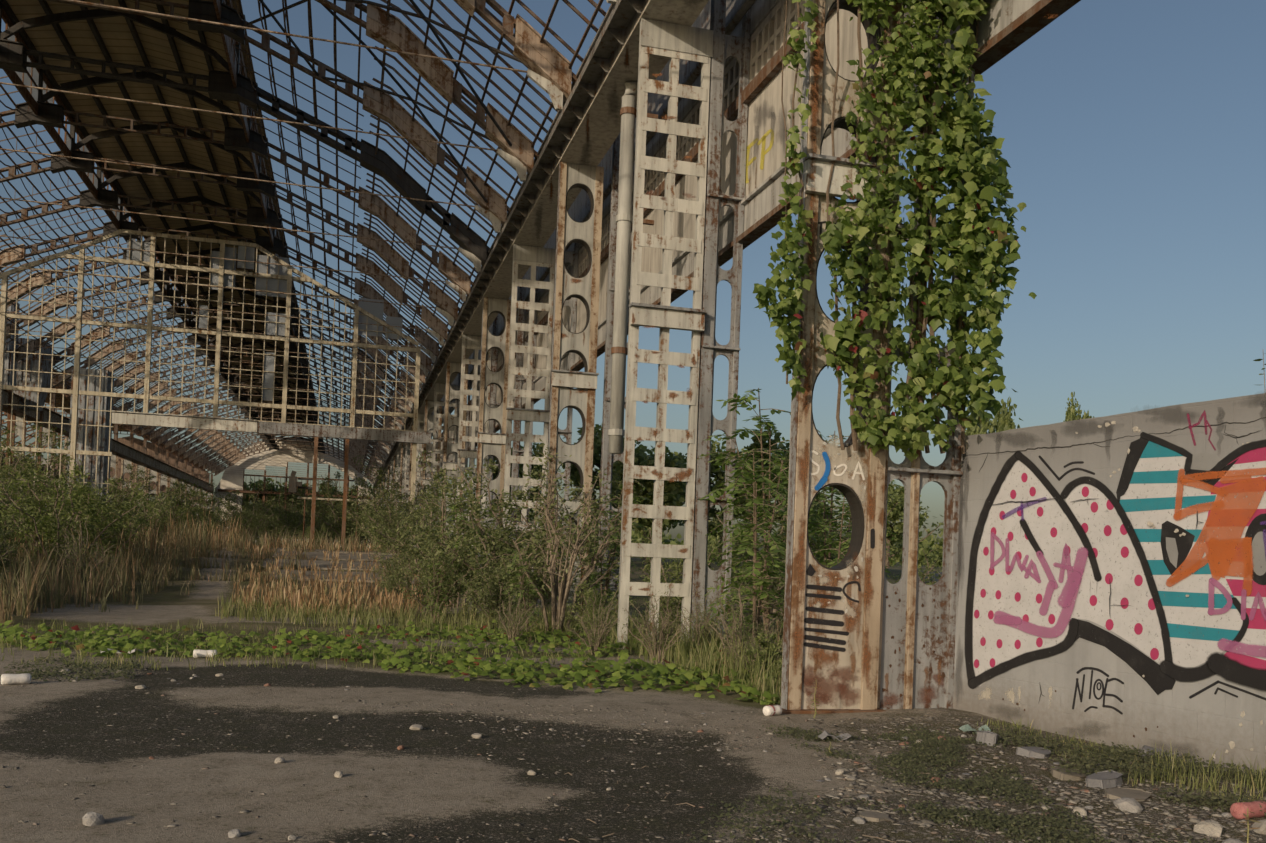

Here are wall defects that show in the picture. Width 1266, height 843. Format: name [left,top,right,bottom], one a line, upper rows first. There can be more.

rust [811,40,820,154]
rust [652,468,693,482]
rust [799,444,809,501]
rust [868,476,876,523]
rust [793,521,873,704]
rust [921,662,943,702]